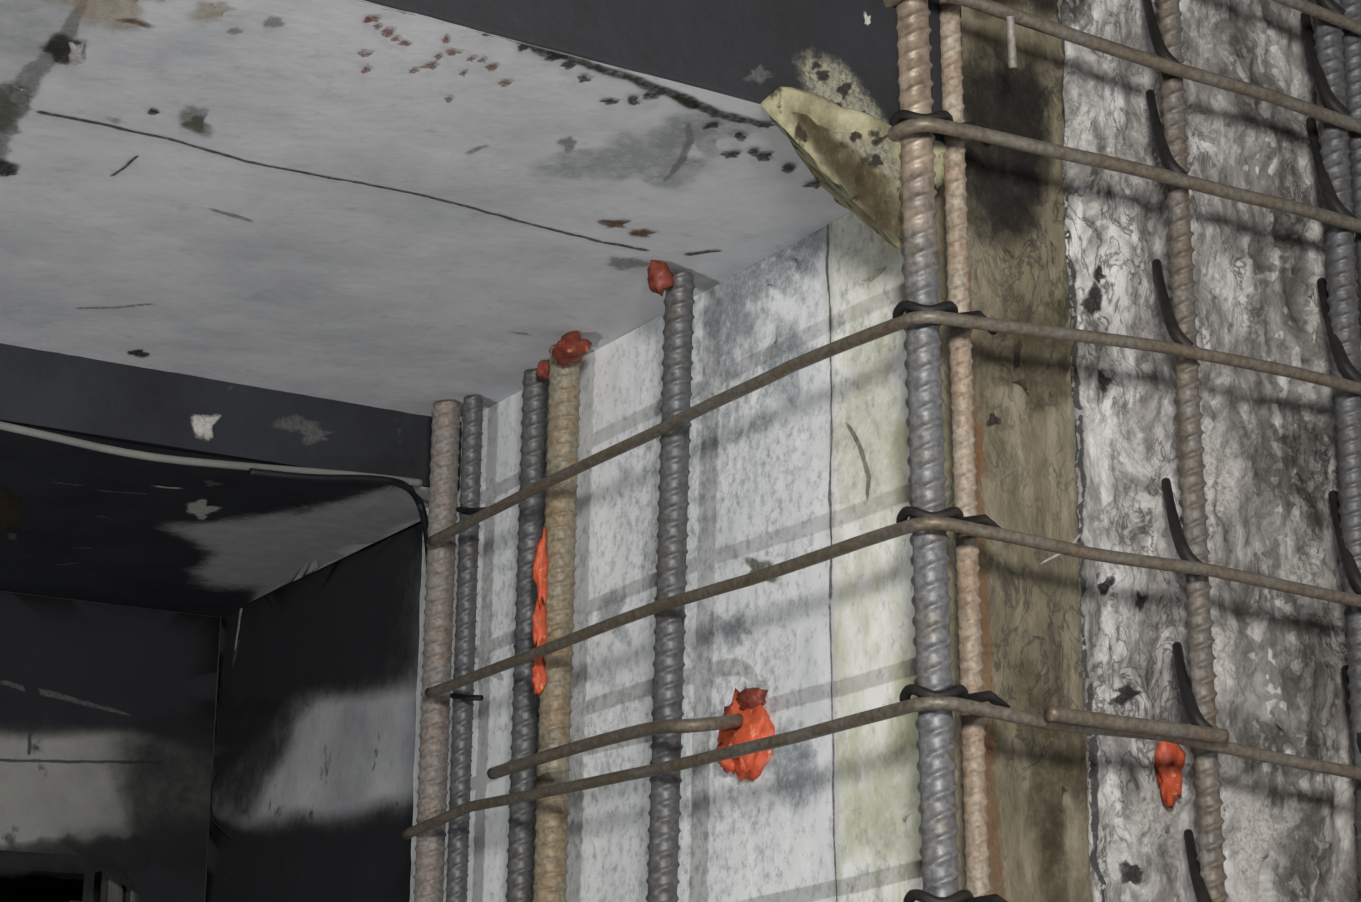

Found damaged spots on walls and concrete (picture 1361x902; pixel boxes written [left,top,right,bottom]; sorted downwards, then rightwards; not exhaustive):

rust [75,0,150,28]
crack [0,97,648,251]
rust [363,16,411,46]
rust [409,36,511,87]
damp [794,113,903,235]
damp [963,46,1050,242]
damp [992,0,1084,15]
spalling [801,0,1001,897]
spalling [1154,0,1219,728]
spalling [1311,0,1361,902]
spalling [505,331,592,902]
spalling [646,260,695,902]